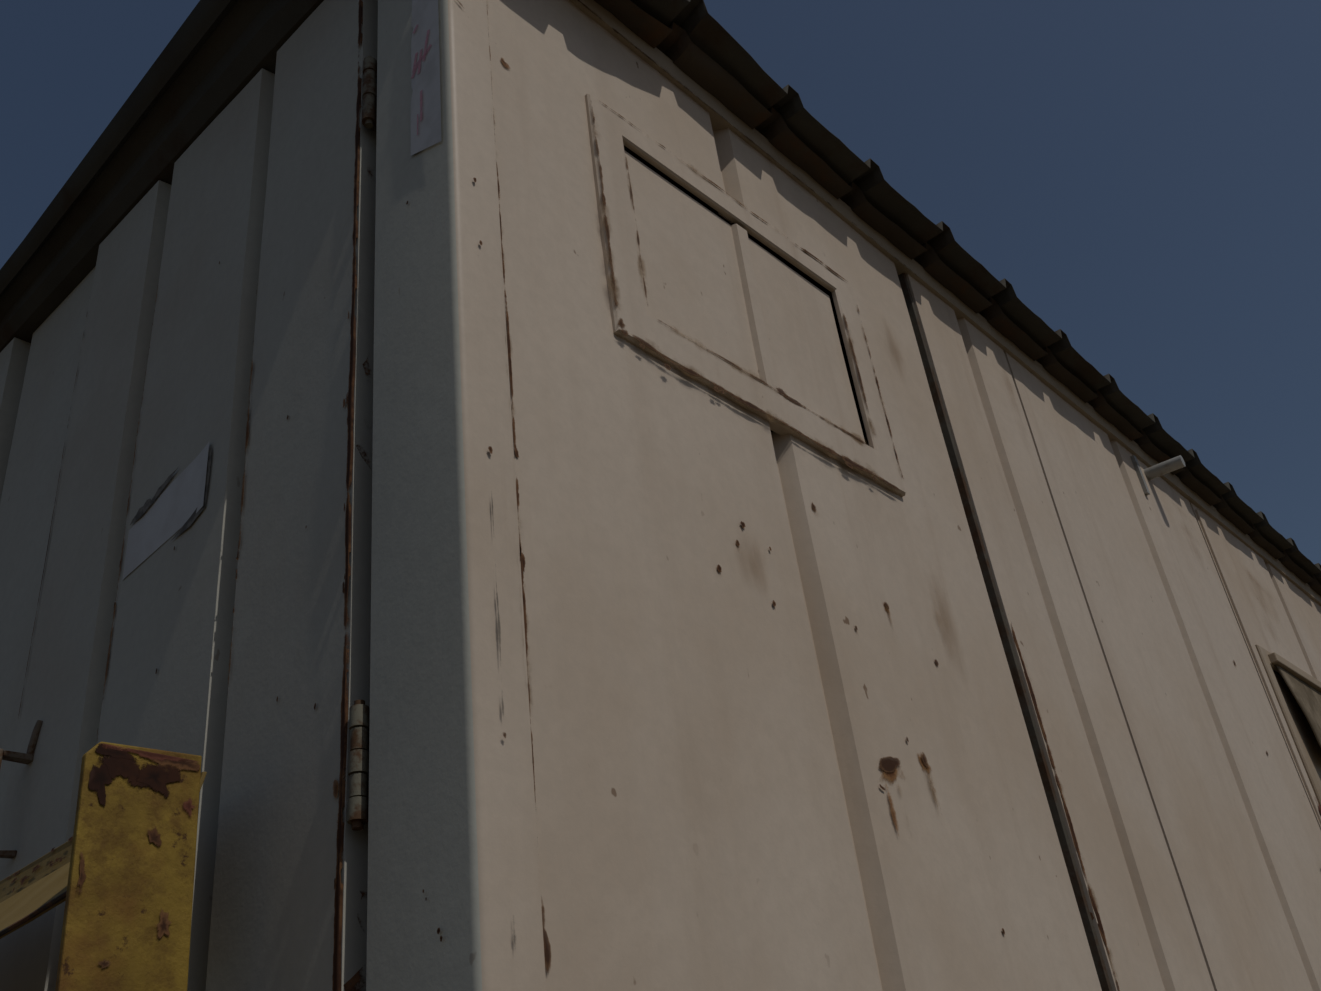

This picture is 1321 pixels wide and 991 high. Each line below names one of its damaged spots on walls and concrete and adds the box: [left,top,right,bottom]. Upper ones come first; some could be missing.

rust [332,0,372,991]
rust [879,756,900,831]
rust [918,752,936,801]